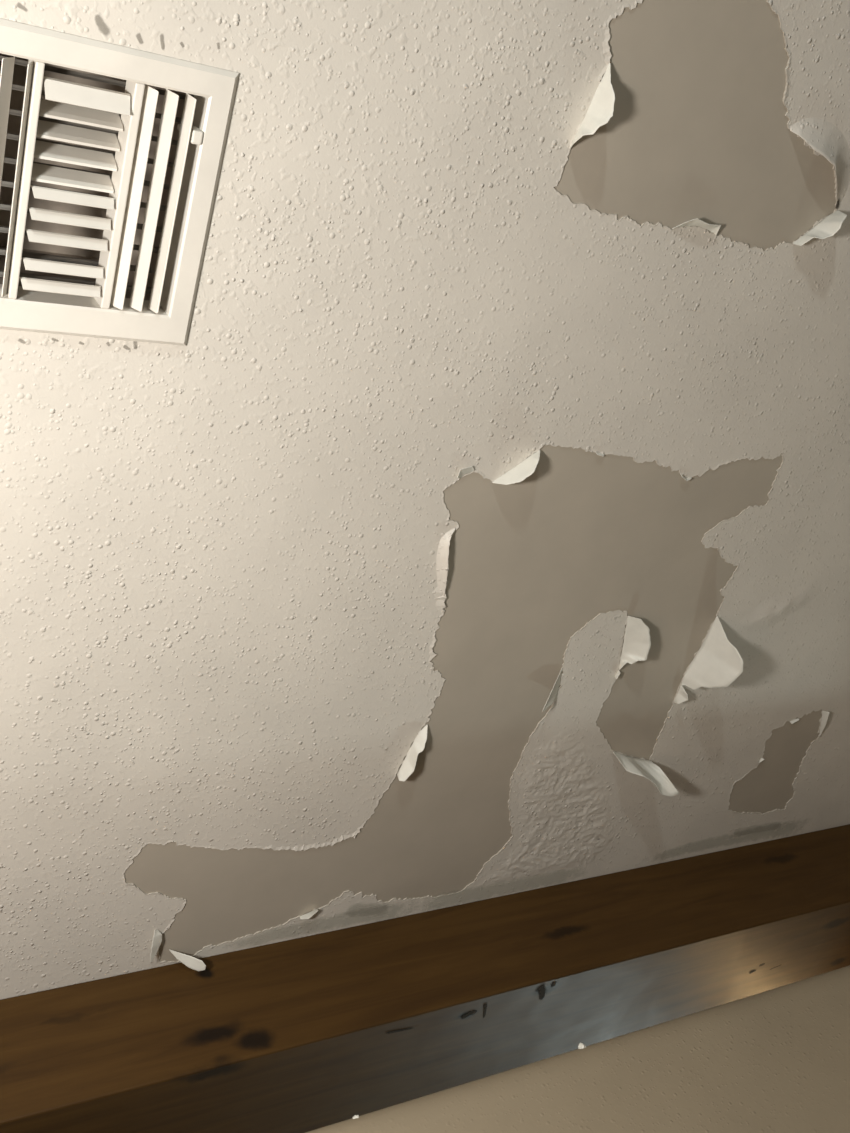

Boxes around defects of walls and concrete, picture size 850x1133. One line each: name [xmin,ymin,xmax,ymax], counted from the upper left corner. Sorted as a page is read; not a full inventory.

peeling [552,0,850,253]
peeling [122,442,785,971]
peeling [727,709,830,816]